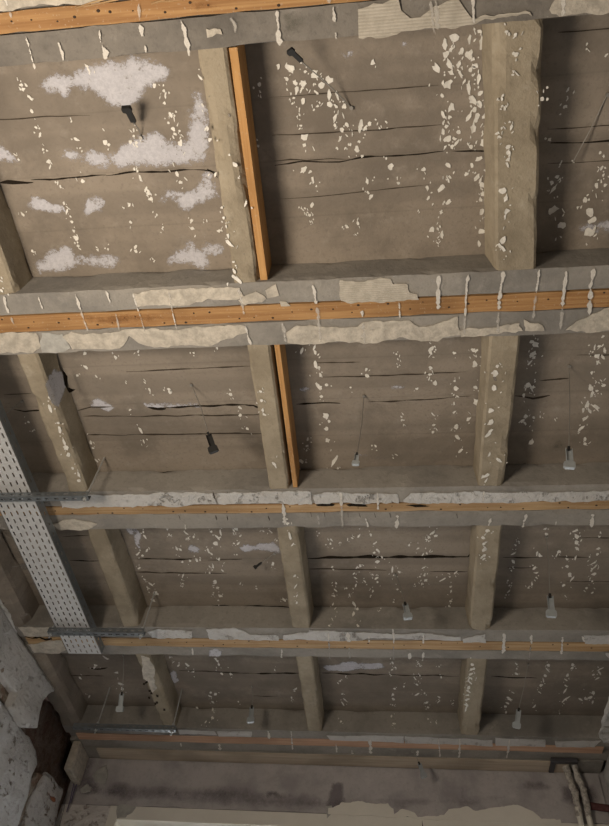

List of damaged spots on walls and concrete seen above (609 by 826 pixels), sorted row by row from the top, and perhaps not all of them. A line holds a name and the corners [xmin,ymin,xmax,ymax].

damp [42,25,168,106]
damp [64,92,209,169]
crack [275,150,484,166]
peeling [495,121,514,168]
crack [0,169,218,184]
damp [161,172,219,210]
peeling [496,187,513,257]
damp [37,246,118,273]
crack [77,404,261,436]
crack [308,553,470,572]
peeling [599,715,609,743]
peeling [328,801,562,825]